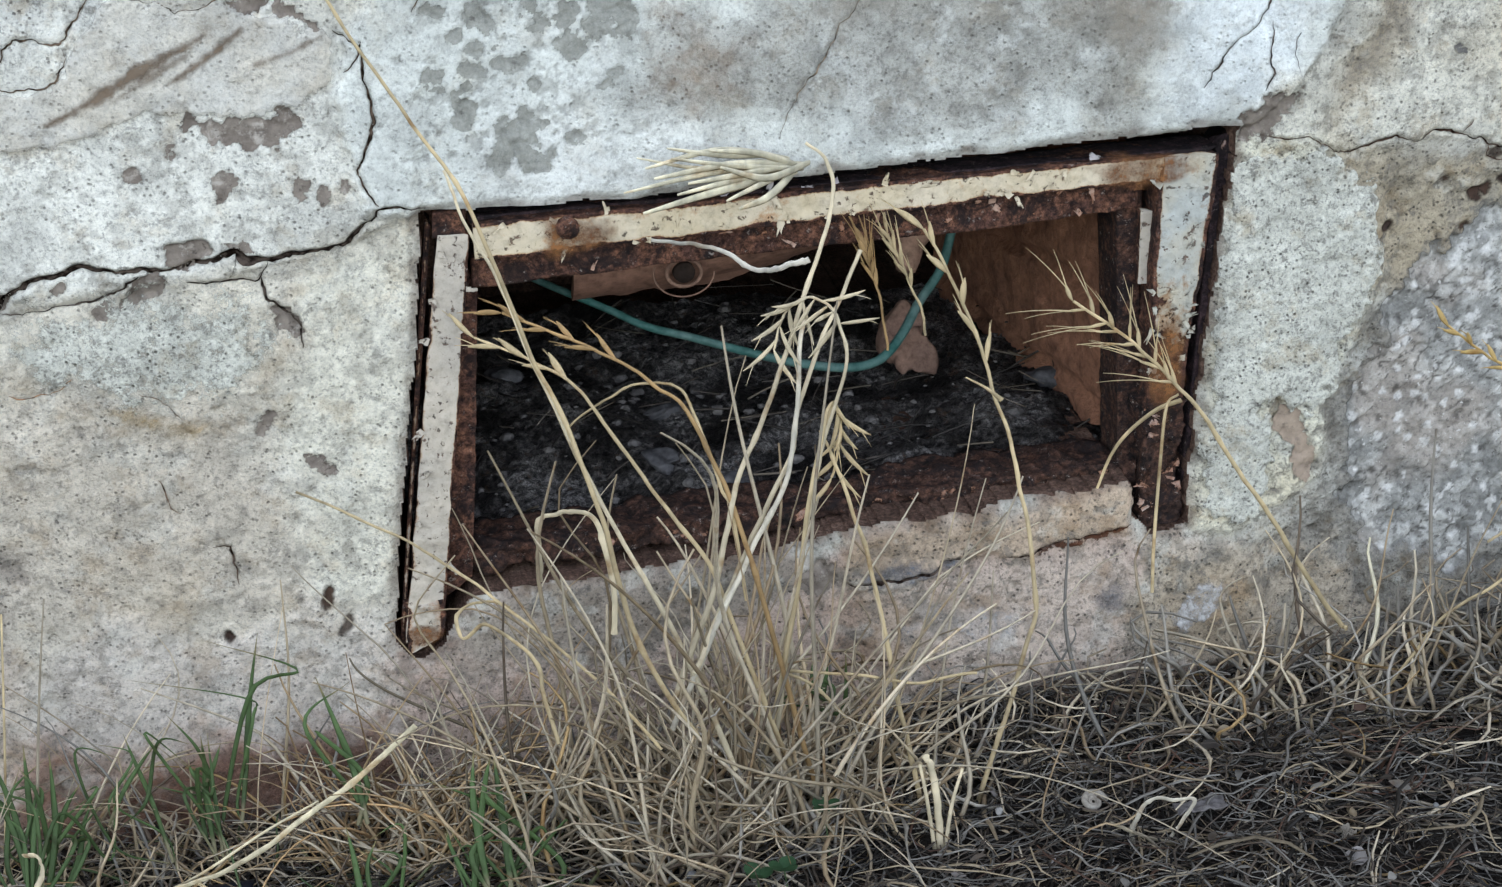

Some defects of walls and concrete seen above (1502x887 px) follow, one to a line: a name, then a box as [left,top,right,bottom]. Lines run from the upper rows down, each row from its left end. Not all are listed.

spalling [226,0,319,32]
crack [0,0,87,94]
crack [1204,0,1302,90]
crack [1255,120,1502,160]
crack [0,30,421,347]
rust [1106,156,1185,185]
rust [548,221,609,256]
spalling [1144,85,1502,574]
rust [1150,329,1182,403]
peeling [1133,458,1181,512]
rust [1038,526,1129,556]
rust [800,559,842,597]